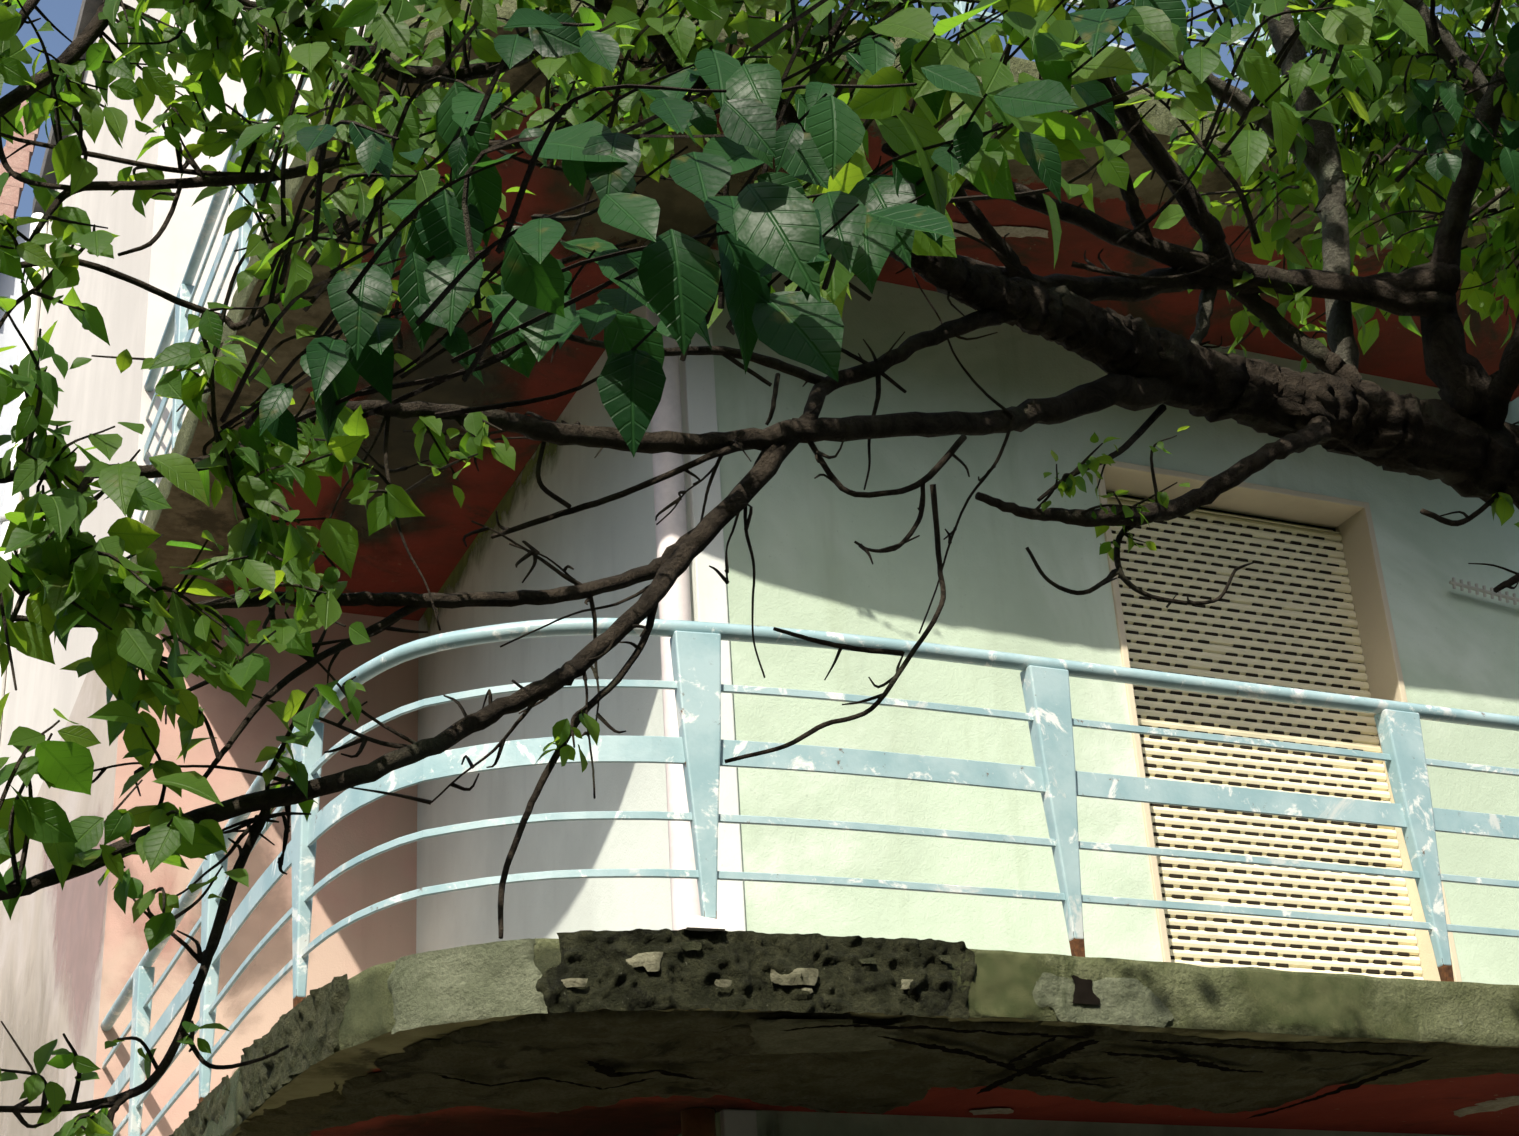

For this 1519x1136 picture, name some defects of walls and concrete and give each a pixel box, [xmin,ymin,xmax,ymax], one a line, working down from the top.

crack [438,1060,698,1090]
spalling [169,915,1519,1136]
crack [783,1024,1432,1119]